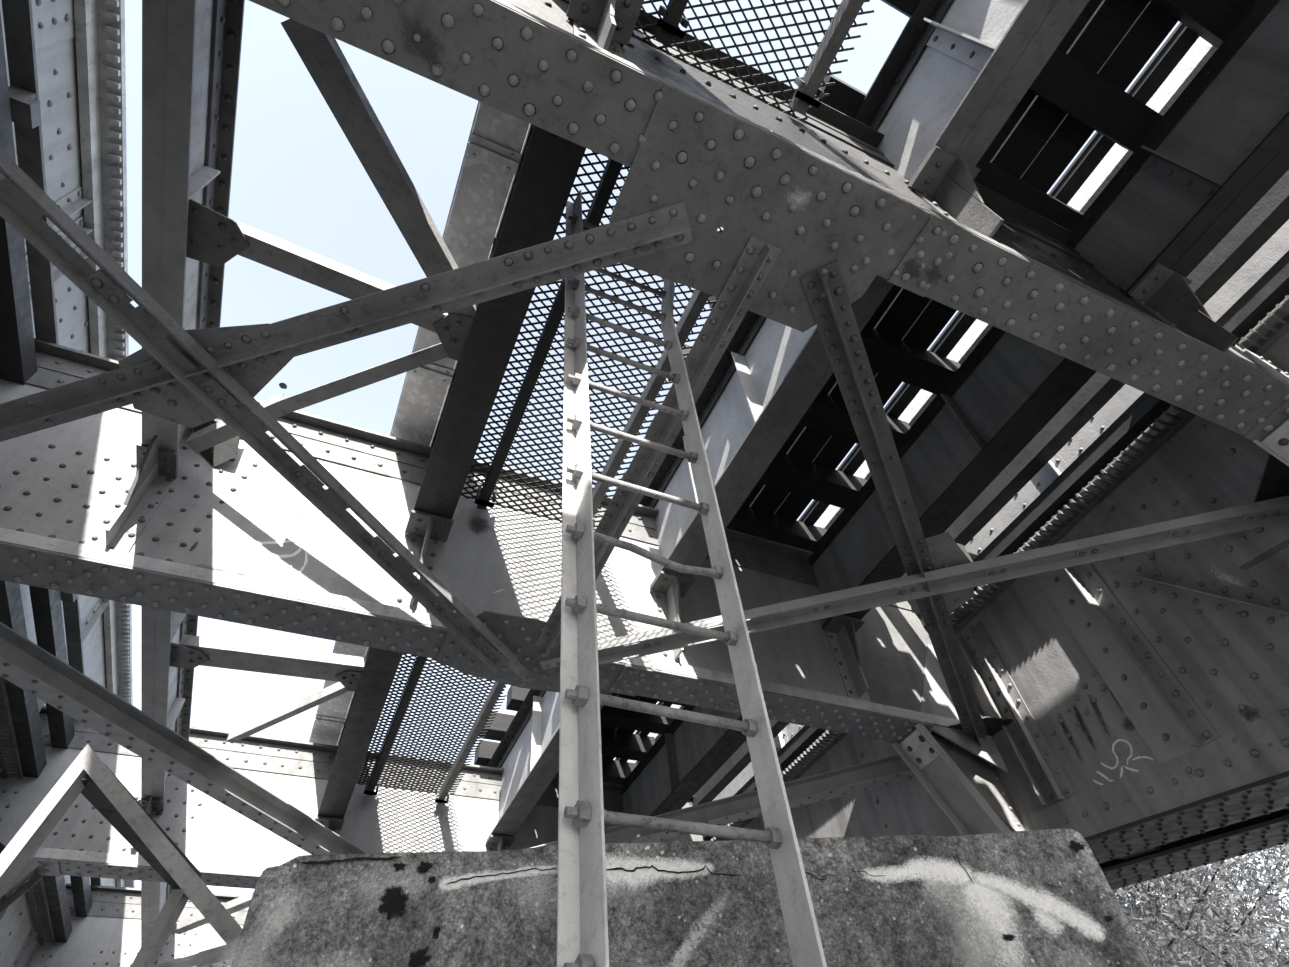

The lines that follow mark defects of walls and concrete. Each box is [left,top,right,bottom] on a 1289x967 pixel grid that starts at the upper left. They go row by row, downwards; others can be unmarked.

damp [1060,695,1105,755]
crack [444,868,556,885]
crack [606,865,742,876]